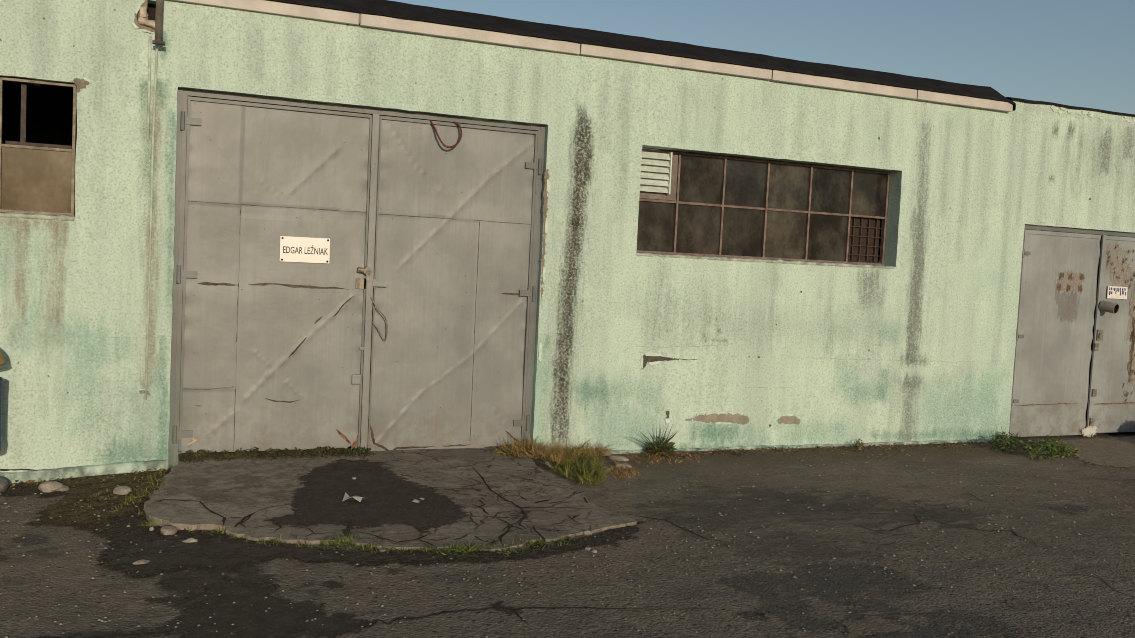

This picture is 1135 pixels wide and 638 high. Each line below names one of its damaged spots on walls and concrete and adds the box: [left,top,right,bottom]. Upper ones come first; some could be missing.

leakage [552,117,591,440]
corrosion [1057,272,1084,293]
corrosion [1107,245,1135,402]
peeling [641,351,697,370]
spalling [686,411,749,424]
spalling [769,414,800,427]
crack [159,468,602,546]
crack [359,601,717,629]